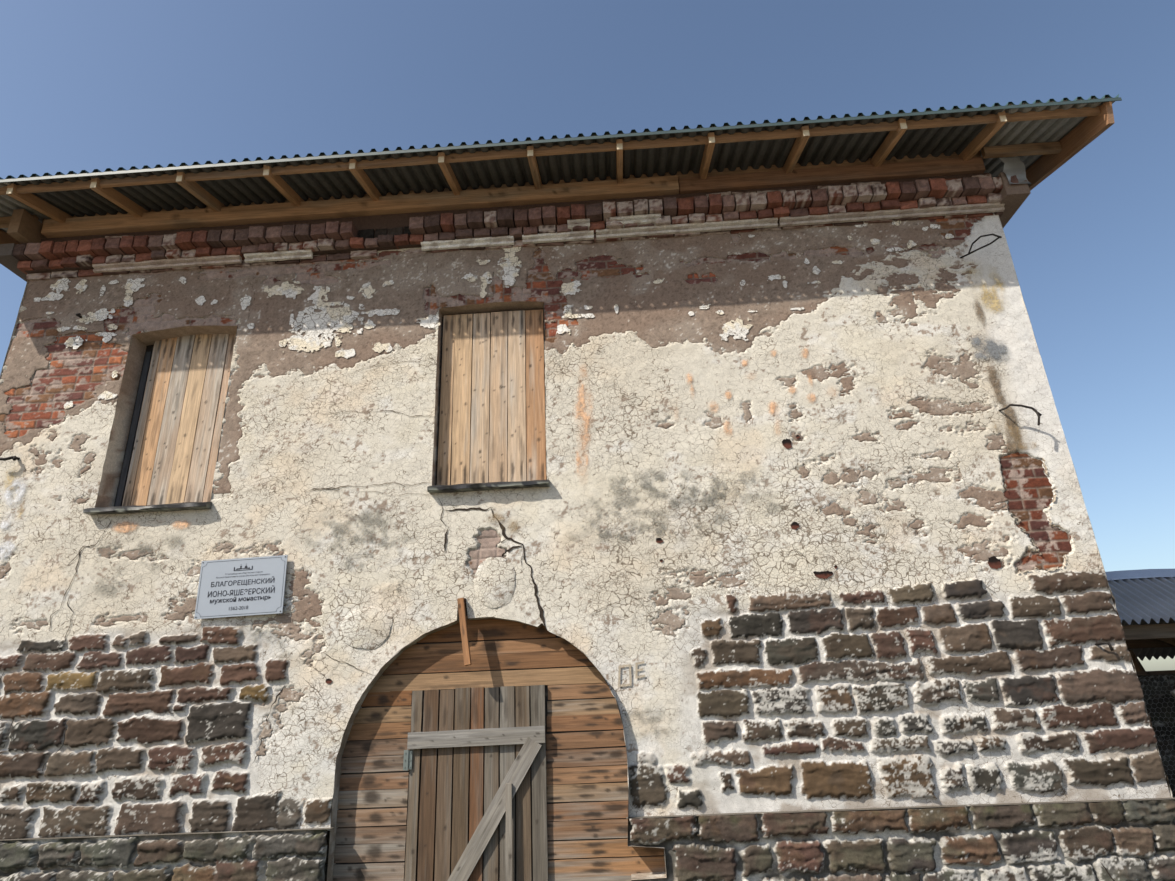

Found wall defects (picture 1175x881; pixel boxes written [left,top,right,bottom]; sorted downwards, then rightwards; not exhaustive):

flaking render [0,216,982,494]
flaking render [795,350,1074,573]
flaking render [0,551,14,579]
crack [49,521,111,640]
flaking render [99,547,169,561]
flaking render [214,542,284,556]
crack [306,482,547,632]
spalling [813,565,837,579]
flaking render [12,620,49,633]
flaking render [94,614,148,626]
flaking render [164,592,197,621]
crack [253,652,377,763]